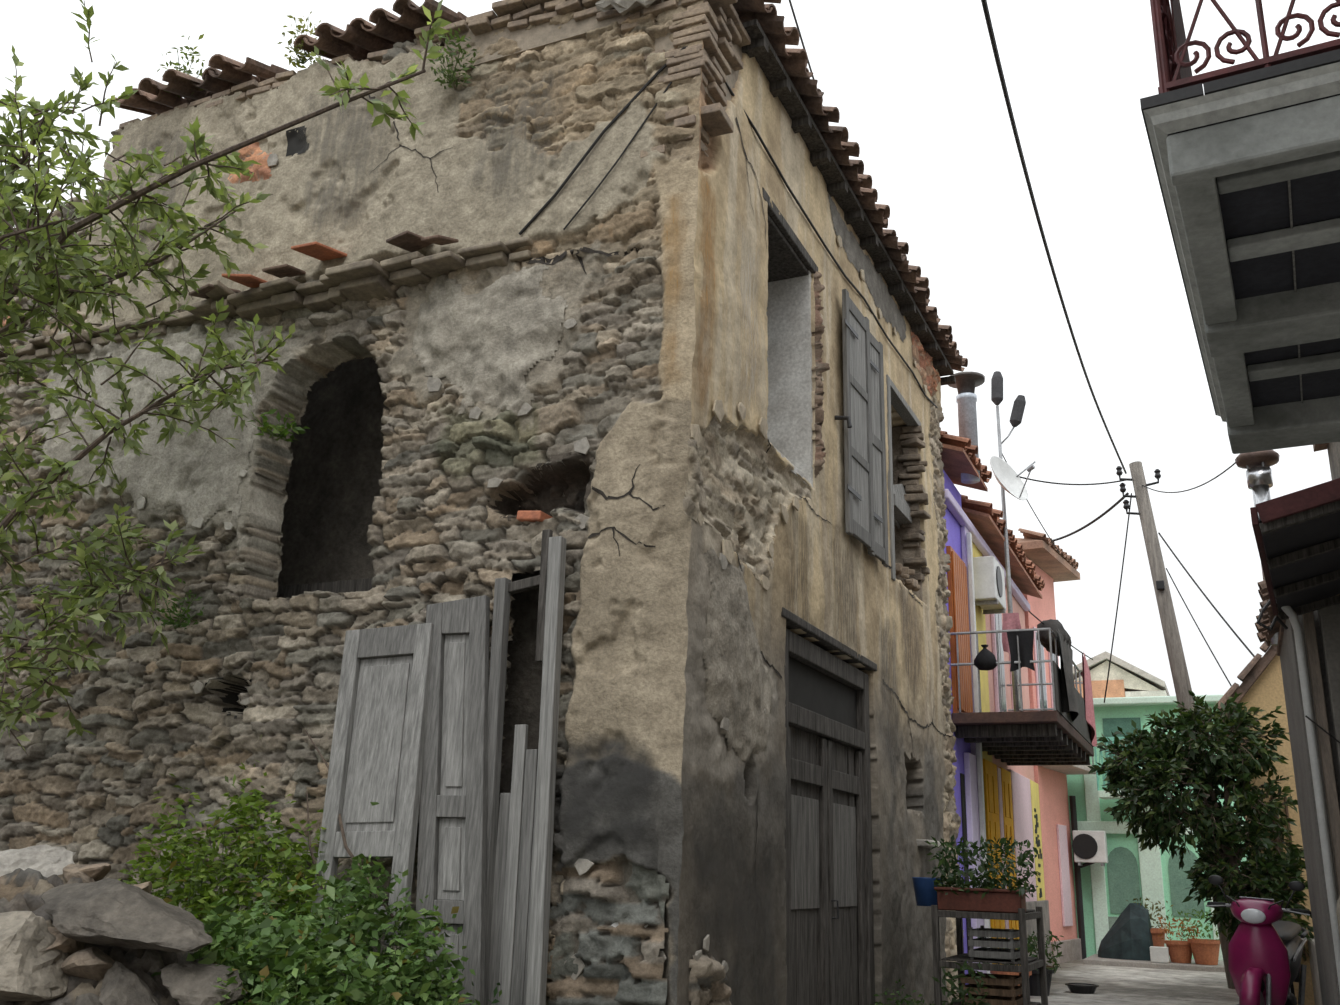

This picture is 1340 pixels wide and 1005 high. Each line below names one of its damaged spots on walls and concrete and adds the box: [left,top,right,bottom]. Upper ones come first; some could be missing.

spalling [218,126,309,189]
peeling [412,264,577,420]
peeling [83,325,263,530]
spalling [683,271,830,591]
spalling [487,437,594,530]
crack [588,464,665,556]
hole [193,675,252,719]
crack [883,679,952,756]
spalling [546,854,669,1005]
spalling [689,934,732,1005]